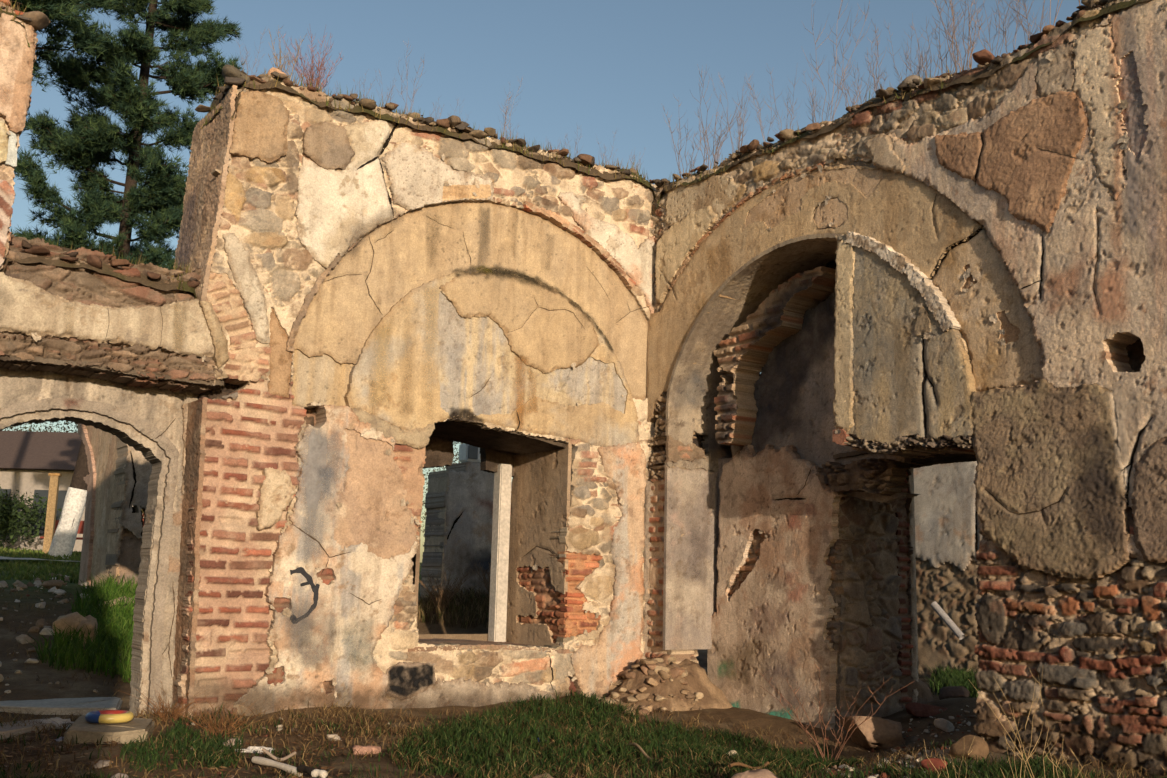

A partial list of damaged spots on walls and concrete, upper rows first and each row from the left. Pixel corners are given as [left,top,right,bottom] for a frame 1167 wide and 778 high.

spalling [715,0,1130,231]
peeling [1114,55,1149,164]
leakage [1125,43,1140,233]
spalling [211,81,701,337]
crack [507,298,585,333]
crack [587,267,676,322]
crack [922,335,937,438]
crack [1121,418,1152,520]
spalling [378,443,625,695]
spalling [727,530,769,596]
spalling [264,666,284,690]
spalling [973,540,1167,776]